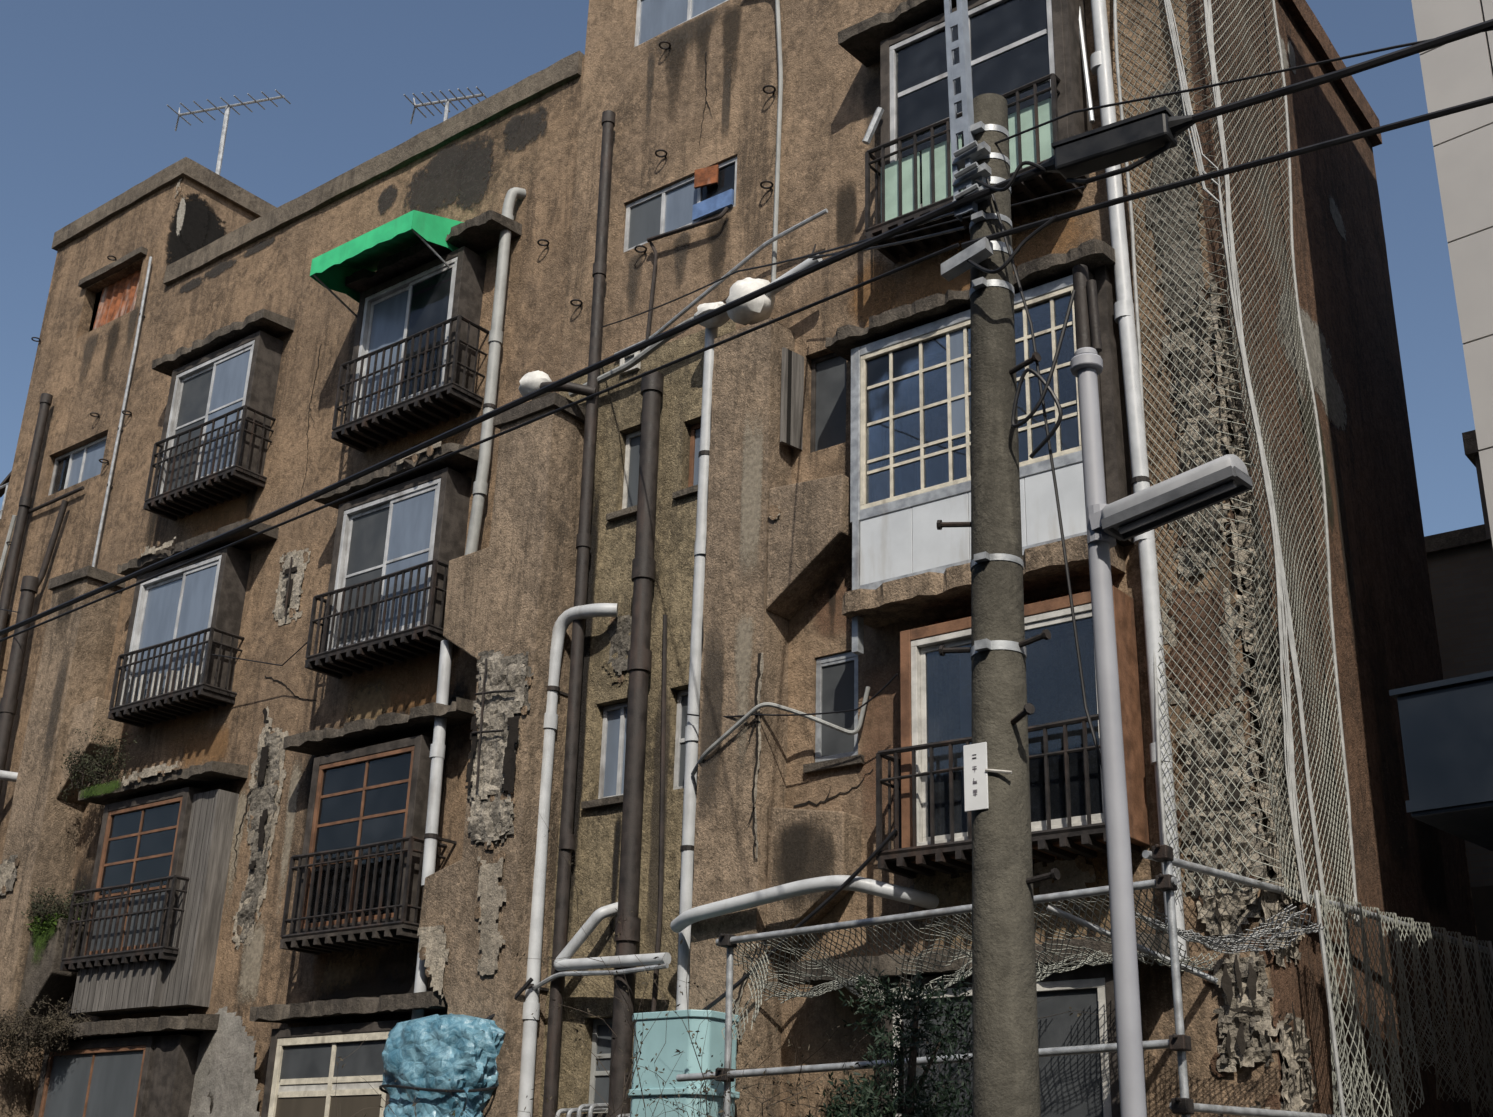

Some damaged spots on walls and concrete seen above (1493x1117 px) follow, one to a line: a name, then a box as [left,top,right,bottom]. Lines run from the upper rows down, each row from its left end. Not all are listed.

leakage [647,8,740,130]
spalling [272,548,311,626]
spalling [1146,69,1318,1117]
spalling [232,723,289,947]
spalling [465,650,534,976]
crack [744,653,764,858]
crack [794,769,873,808]